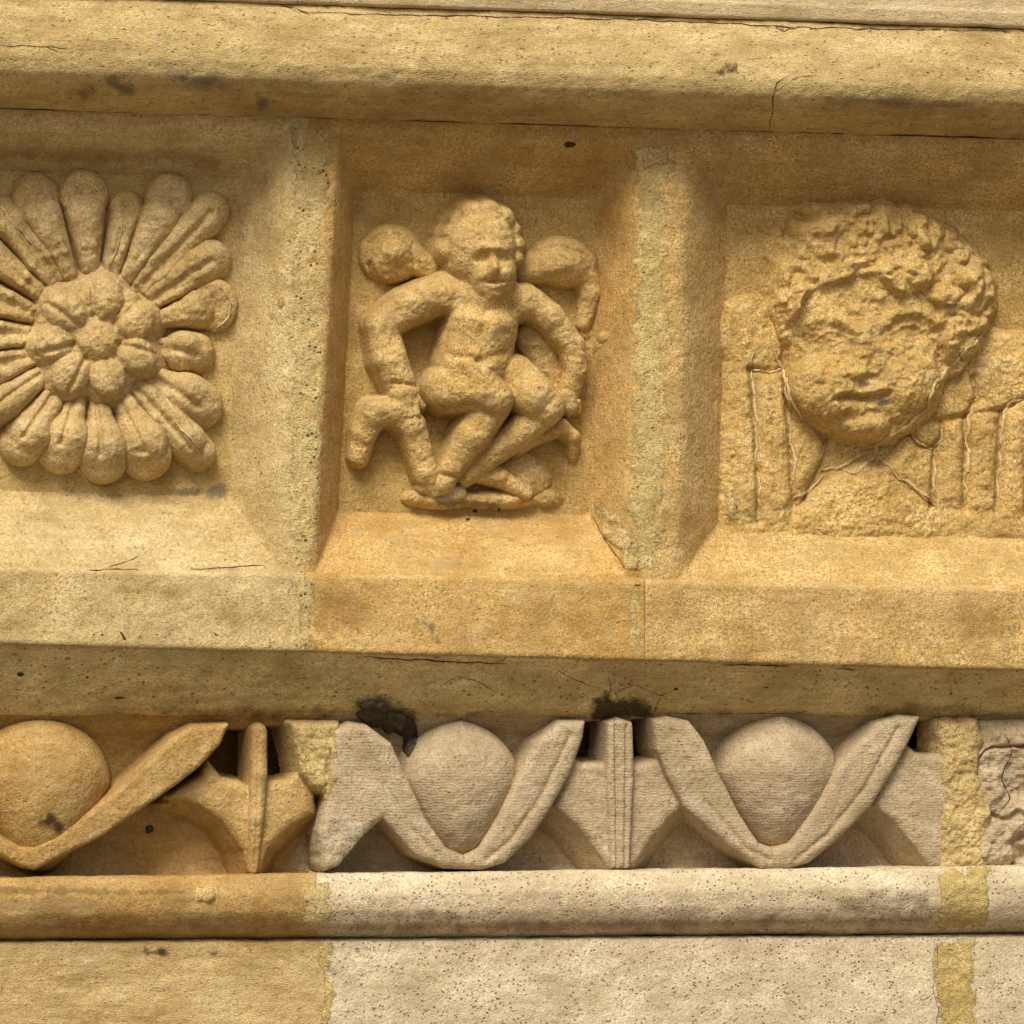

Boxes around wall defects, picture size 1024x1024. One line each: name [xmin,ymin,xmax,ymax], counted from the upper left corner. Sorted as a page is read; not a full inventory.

crack [365,656,506,691]
crack [558,670,670,715]